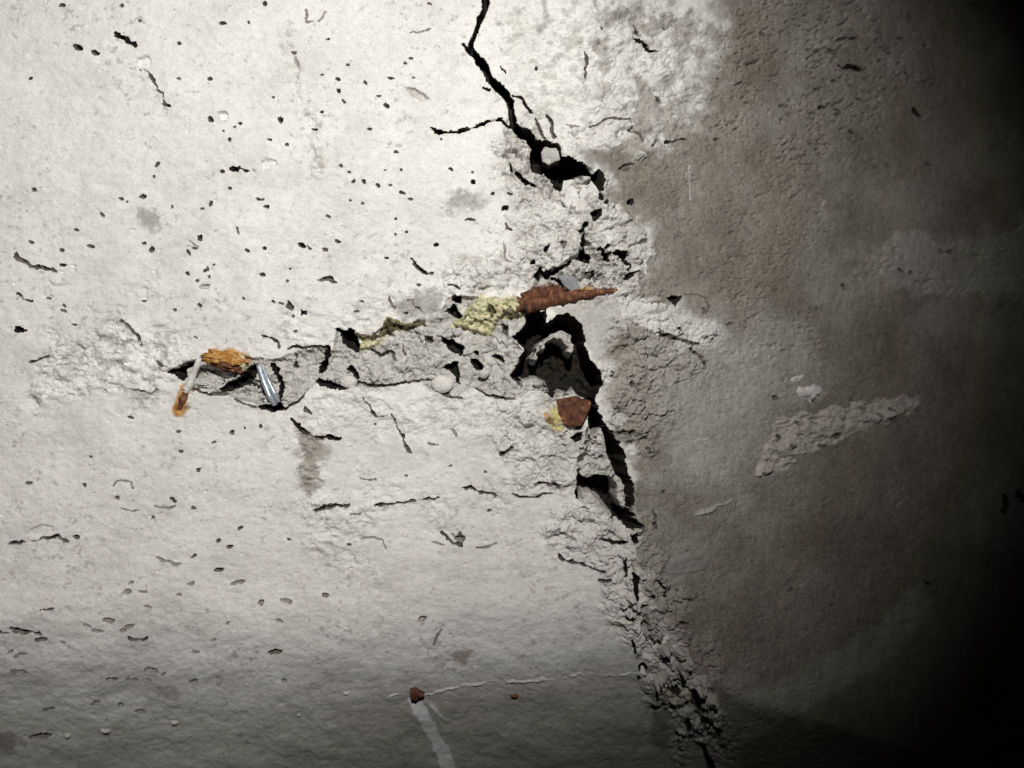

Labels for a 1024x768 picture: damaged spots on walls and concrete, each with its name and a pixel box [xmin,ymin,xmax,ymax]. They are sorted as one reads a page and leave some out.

crack [430,0,536,152]
crack [582,51,590,79]
crack [604,198,634,206]
crack [503,223,513,262]
crack [410,258,461,290]
rust [516,284,618,316]
rust [219,349,251,375]
rust [172,385,190,416]
spalling [166,294,658,531]
rust [544,396,591,430]
crack [499,446,514,456]